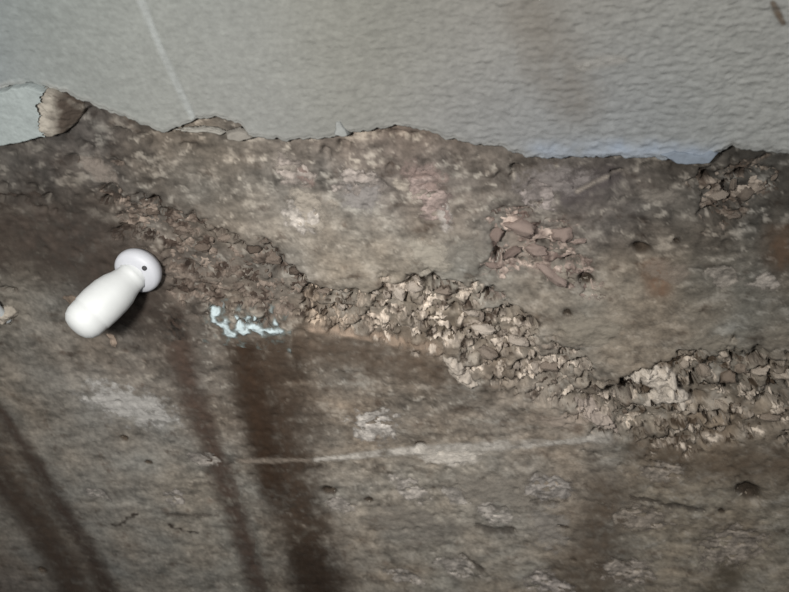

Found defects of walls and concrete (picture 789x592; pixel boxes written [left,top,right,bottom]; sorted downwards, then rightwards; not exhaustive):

peeling [175,125,253,142]
spalling [275,152,317,186]
spalling [332,167,388,196]
spalling [408,163,452,223]
peeling [661,150,718,165]
spalling [281,199,319,235]
spalling [704,265,780,289]
water stain [81,380,179,427]
water stain [166,315,267,592]
water stain [210,306,345,592]
water stain [0,408,116,592]
water stain [570,487,617,592]